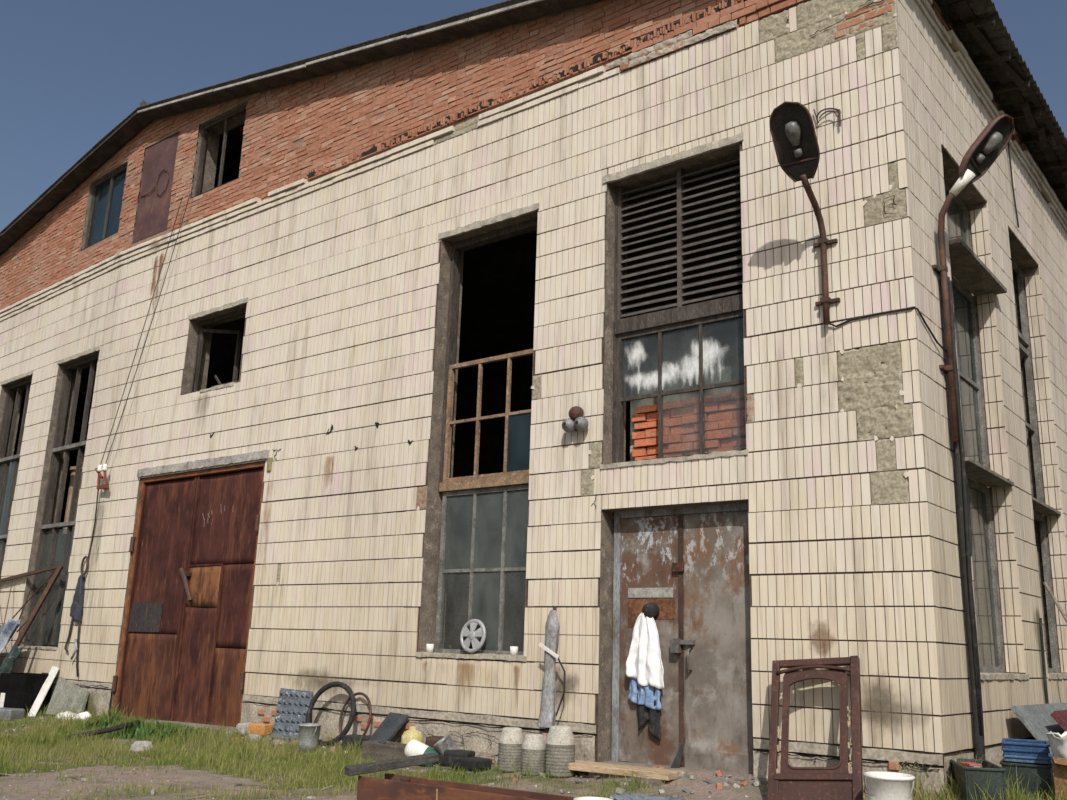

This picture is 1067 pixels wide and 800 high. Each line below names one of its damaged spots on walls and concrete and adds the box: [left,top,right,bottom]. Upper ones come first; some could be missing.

spalling [759,0,898,63]
peeling [863,162,909,227]
peeling [837,342,914,505]